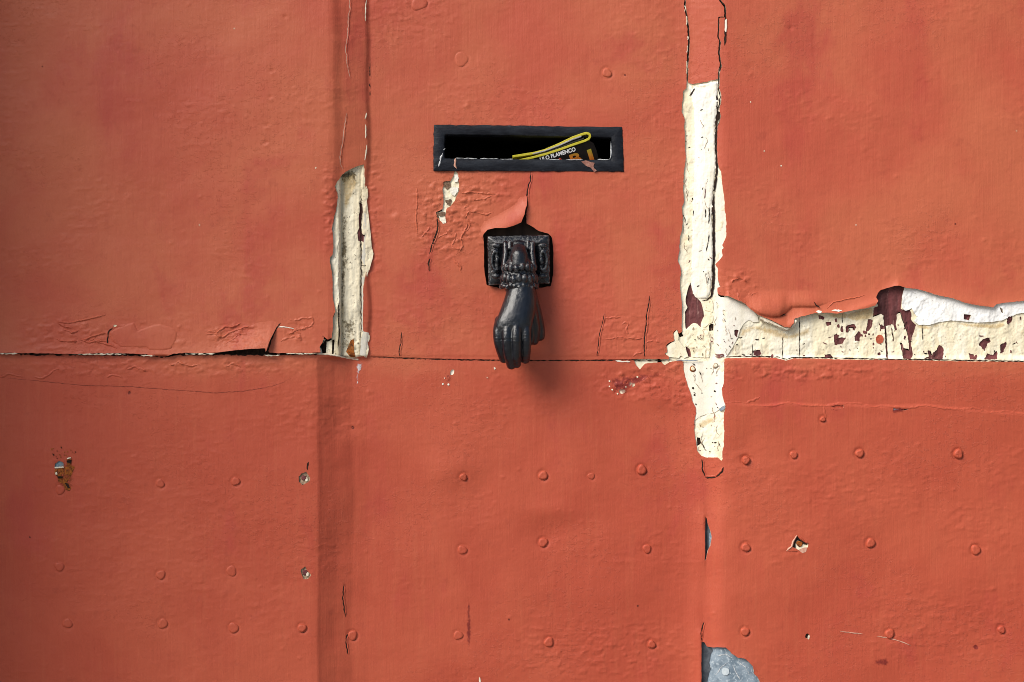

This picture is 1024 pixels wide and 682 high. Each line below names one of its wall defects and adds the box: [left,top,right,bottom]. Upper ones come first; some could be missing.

crack [682,0,690,81]
crack [718,0,727,108]
peeling [436,171,459,224]
peeling [479,196,527,239]
peeling [320,165,374,358]
peeling [609,65,1024,460]
crack [0,332,500,393]